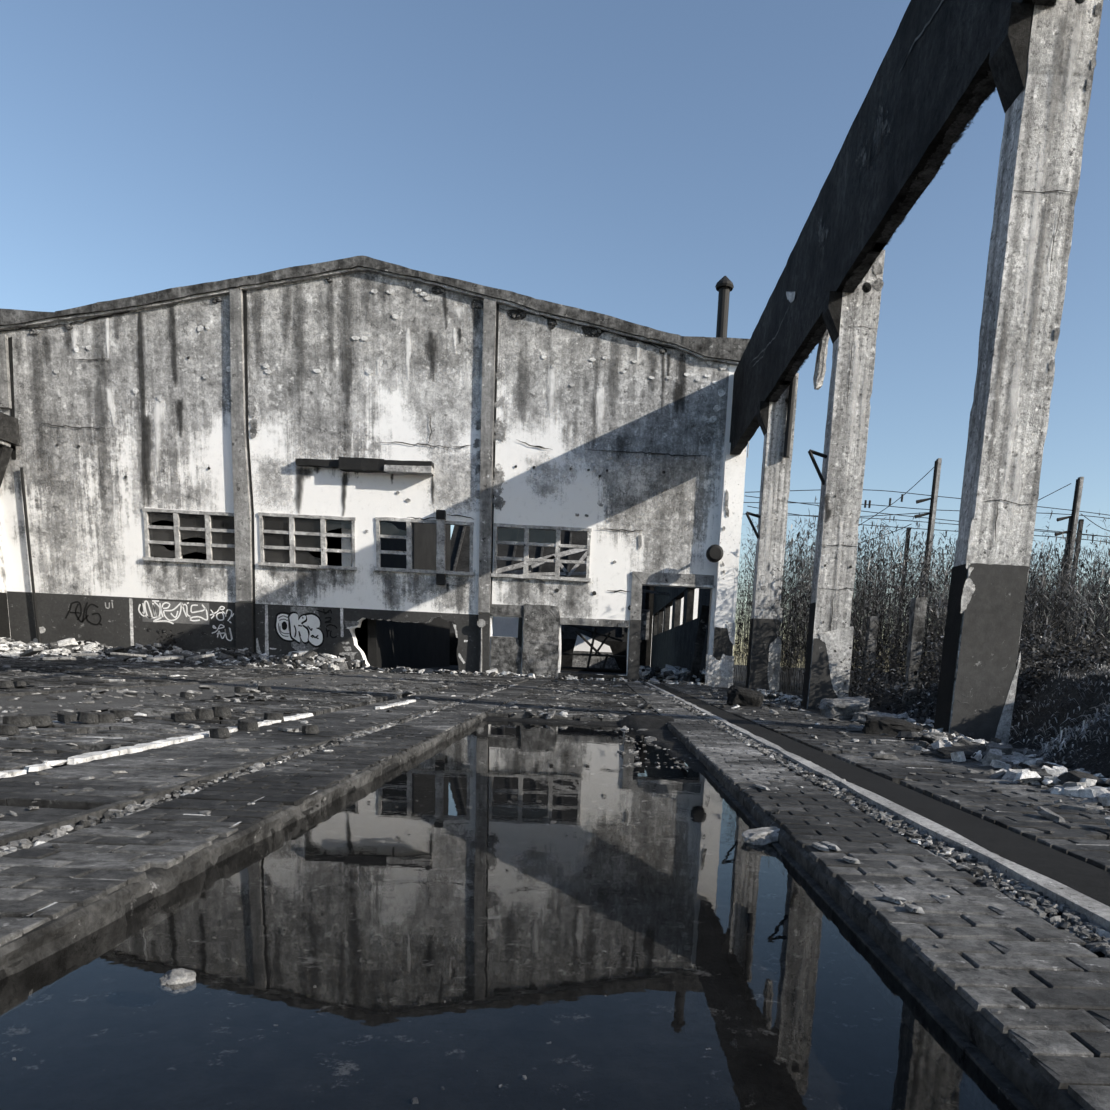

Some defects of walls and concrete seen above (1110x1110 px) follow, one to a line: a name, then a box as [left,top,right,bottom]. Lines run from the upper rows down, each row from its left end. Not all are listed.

damp [443,293,480,346]
damp [427,332,436,375]
damp [106,388,115,426]
damp [137,305,183,502]
damp [548,368,556,413]
damp [596,388,604,427]
damp [661,353,693,411]
crack [381,418,470,448]
flaking render [371,571,473,664]